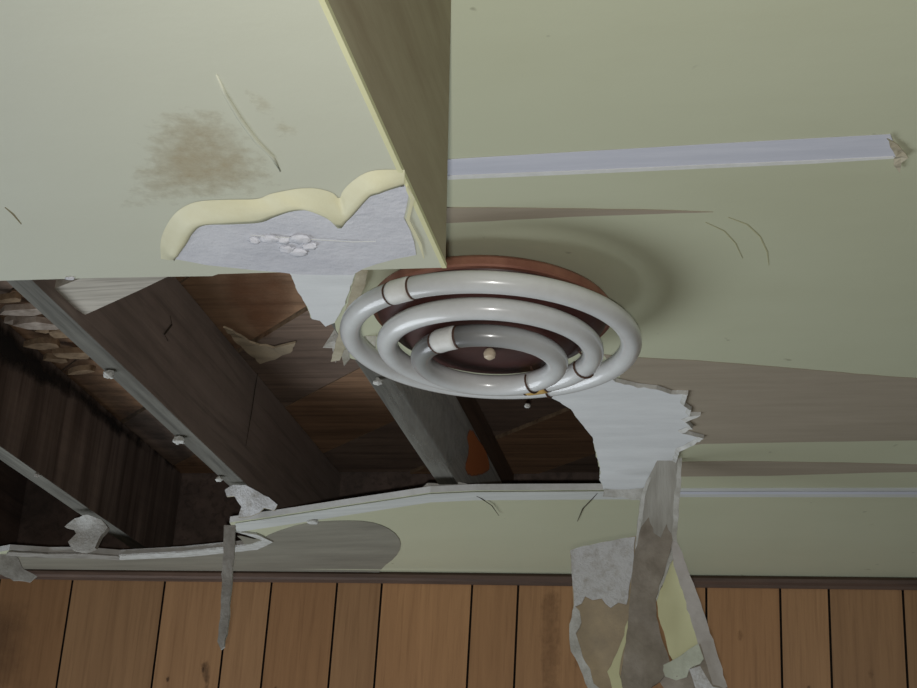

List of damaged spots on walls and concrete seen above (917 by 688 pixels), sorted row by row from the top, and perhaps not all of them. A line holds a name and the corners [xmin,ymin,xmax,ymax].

spalling [160,170,424,366]
corrosion [466,431,489,476]
peeling [552,357,917,489]